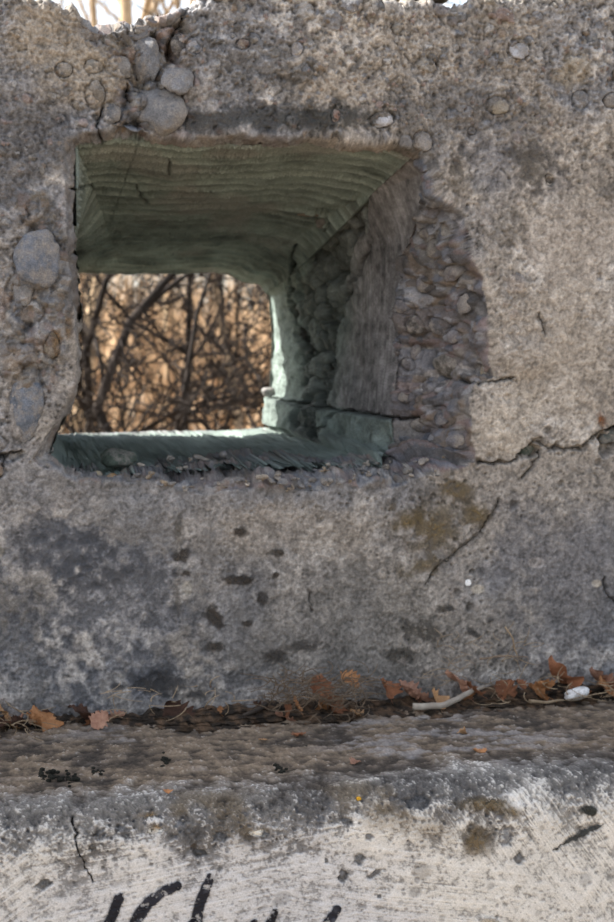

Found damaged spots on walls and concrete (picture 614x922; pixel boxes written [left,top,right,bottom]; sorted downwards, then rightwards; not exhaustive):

crack [492,426,614,477]